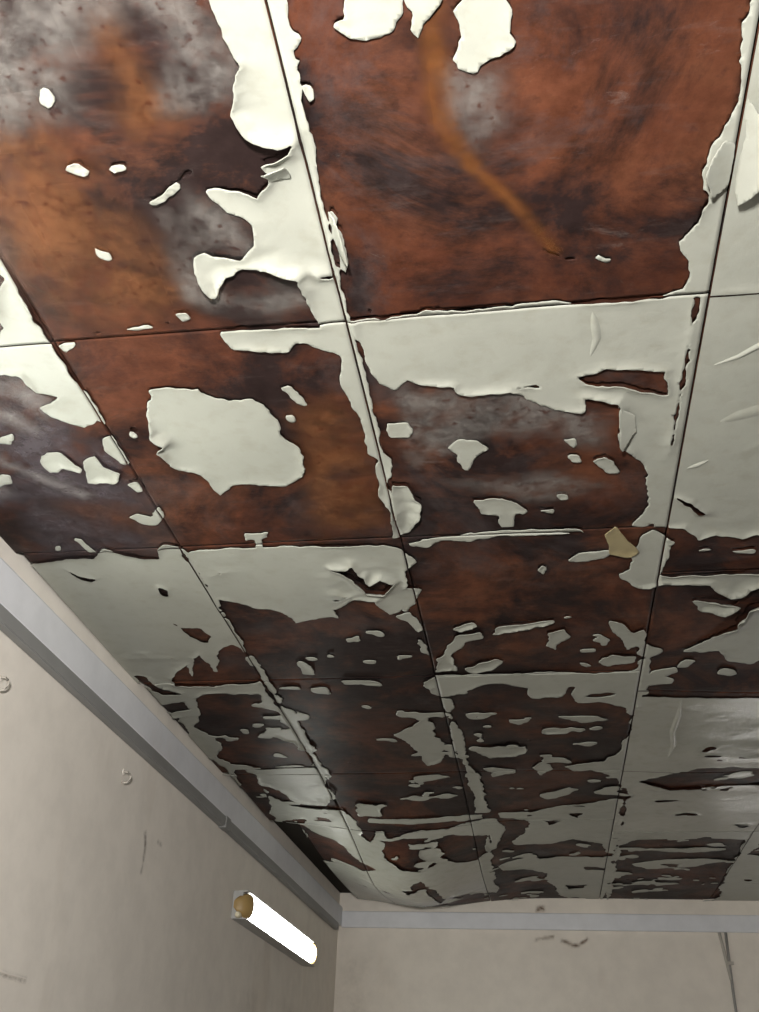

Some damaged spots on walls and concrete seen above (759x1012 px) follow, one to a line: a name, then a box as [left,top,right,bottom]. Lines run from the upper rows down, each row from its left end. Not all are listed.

peeling [0,0,759,563]
peeling [136,526,759,907]